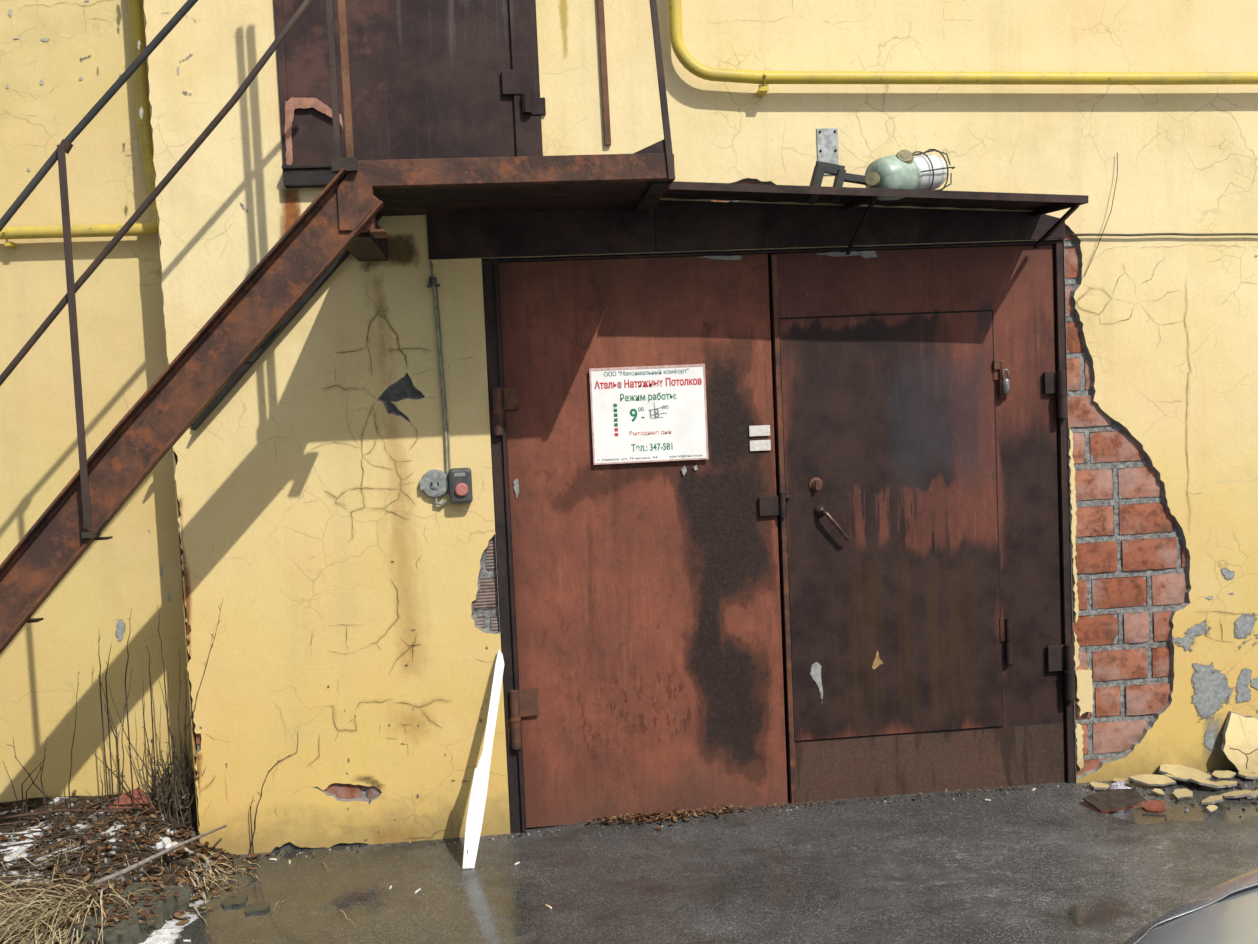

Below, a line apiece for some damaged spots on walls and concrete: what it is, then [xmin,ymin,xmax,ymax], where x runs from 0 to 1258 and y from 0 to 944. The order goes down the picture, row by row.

corrosion [283,190,300,235]
flaking render [378,373,425,422]
crack [275,301,442,767]
flaking render [1064,224,1258,779]
corrosion [182,551,190,645]
flaking render [471,534,501,649]
flaking render [312,758,382,810]